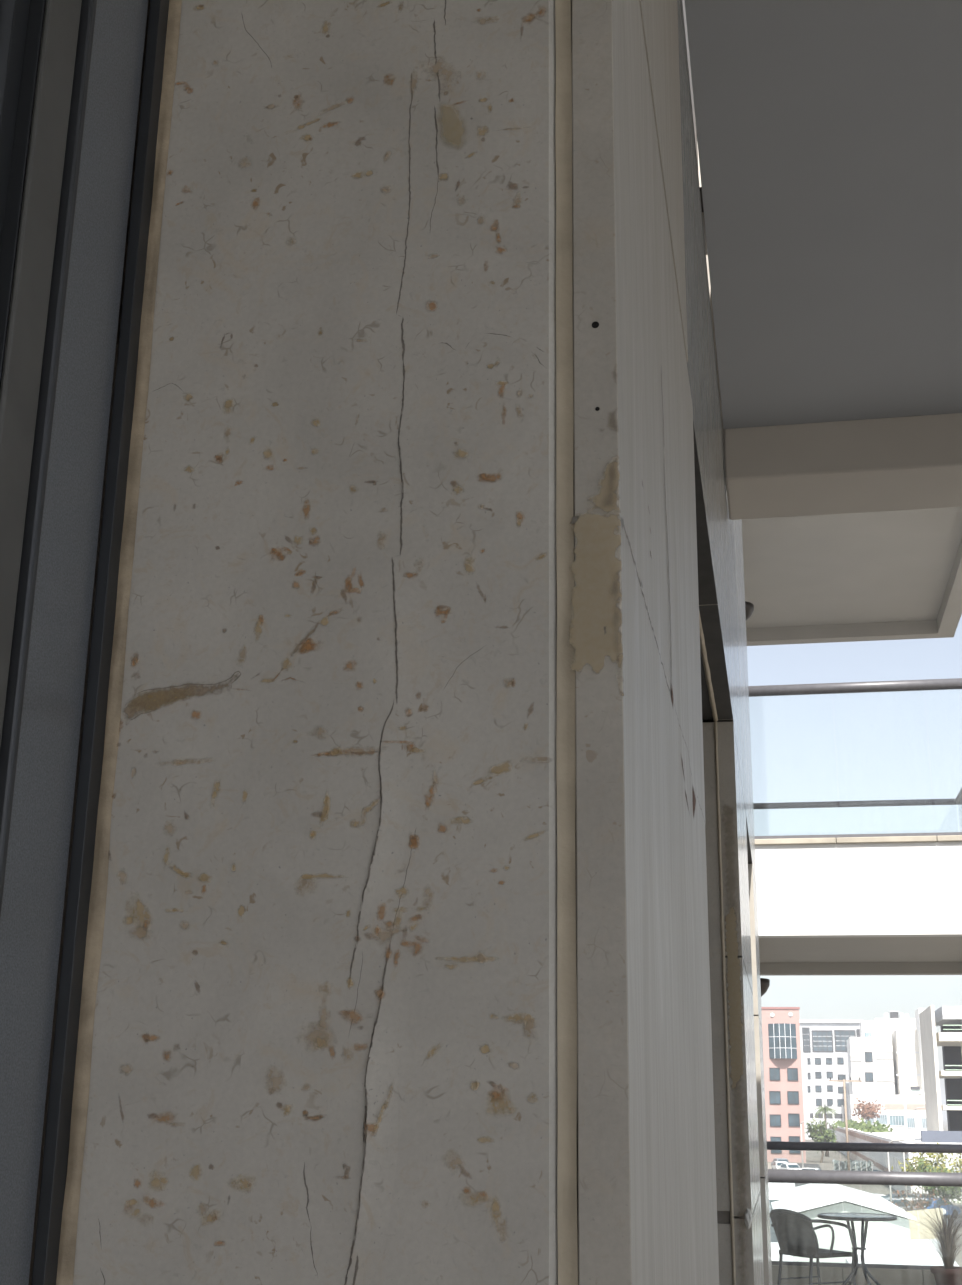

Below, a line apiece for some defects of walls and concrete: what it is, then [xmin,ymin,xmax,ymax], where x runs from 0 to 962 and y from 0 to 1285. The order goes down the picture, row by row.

crack [303,0,446,1285]
peeling [570,462,623,673]
crack [621,469,704,818]